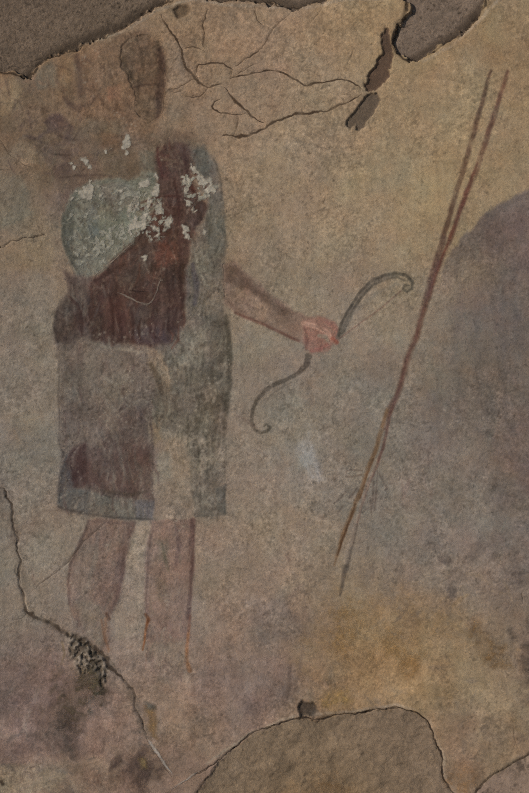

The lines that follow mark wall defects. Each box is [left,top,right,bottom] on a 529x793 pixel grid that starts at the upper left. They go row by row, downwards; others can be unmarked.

flaking render [0,0,169,80]
crack [0,0,359,138]
flaking render [237,0,327,12]
crack [394,2,419,62]
flaking render [346,0,484,131]
peeling [121,134,131,155]
peeling [69,173,172,268]
peeling [181,166,218,212]
crack [15,545,61,631]
crack [92,646,123,679]